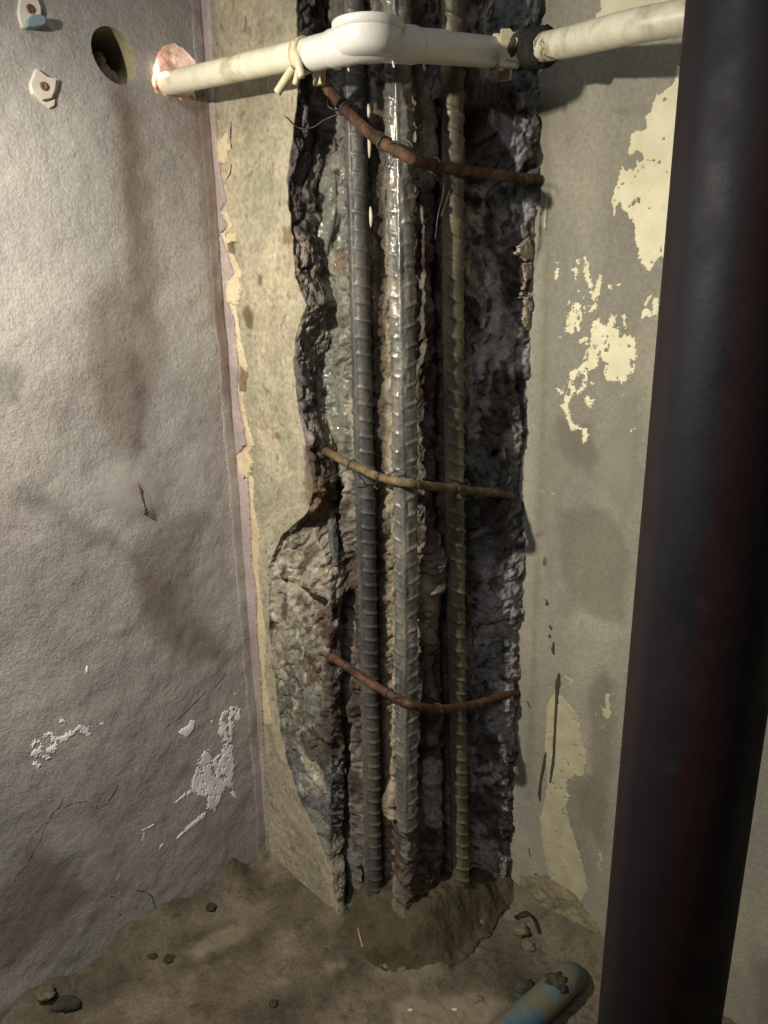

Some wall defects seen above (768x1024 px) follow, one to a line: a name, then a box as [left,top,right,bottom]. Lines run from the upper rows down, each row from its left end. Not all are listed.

spalling [364,0,382,12]
spalling [411,0,440,29]
spalling [464,0,546,36]
peeling [611,66,680,271]
peeling [554,256,638,444]
peeling [641,294,659,319]
spalling [152,0,365,916]
spalling [366,63,452,920]
spalling [463,67,601,937]